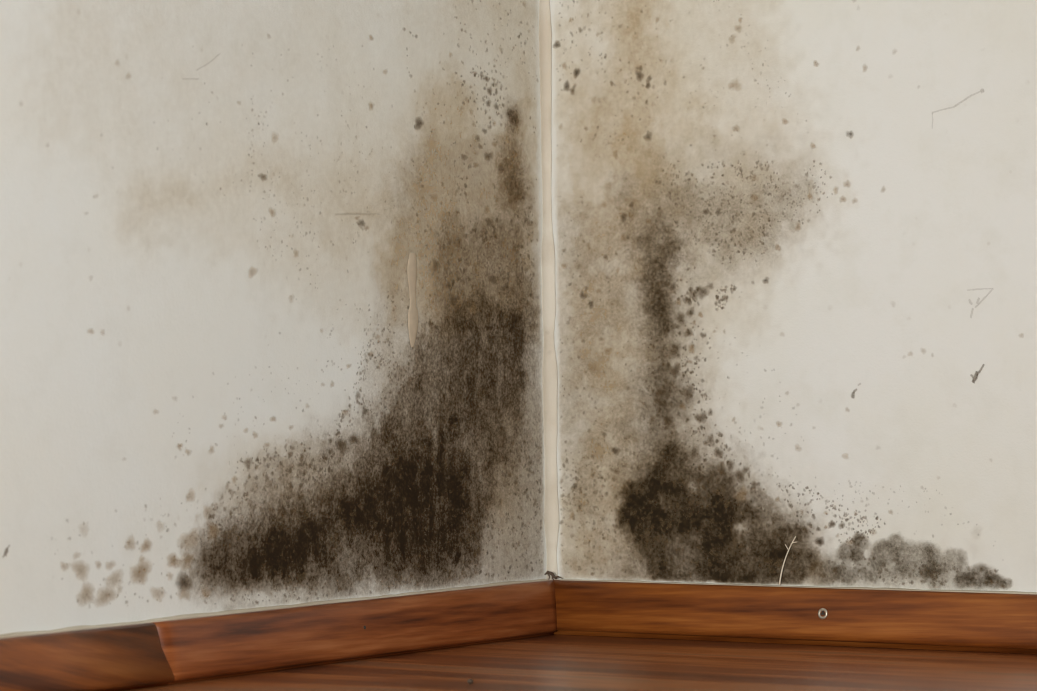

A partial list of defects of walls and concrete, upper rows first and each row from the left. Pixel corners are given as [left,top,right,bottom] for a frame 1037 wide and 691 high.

damp [474,73,525,201]
damp [171,137,540,595]
damp [616,213,843,584]